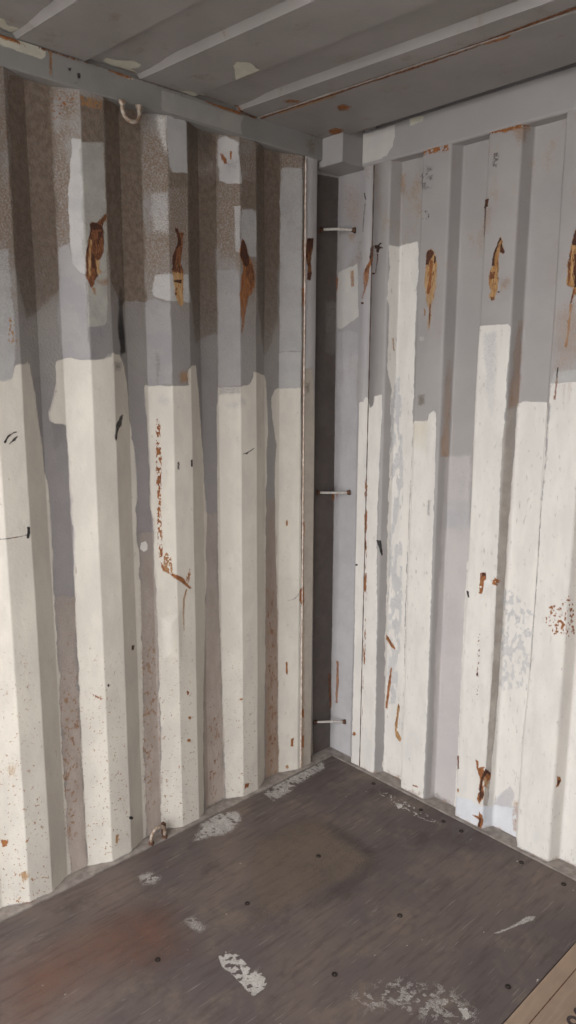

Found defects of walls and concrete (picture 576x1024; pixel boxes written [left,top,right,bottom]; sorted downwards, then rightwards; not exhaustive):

corrosion [85,214,107,295]
corrosion [172,228,184,306]
corrosion [239,239,256,333]
corrosion [301,226,328,393]
corrosion [424,248,438,329]
corrosion [483,199,510,301]
corrosion [551,230,576,409]
corrosion [53,418,305,873]
corrosion [479,572,500,606]
corrosion [546,595,575,640]
corrosion [385,668,401,741]
corrosion [456,760,518,830]